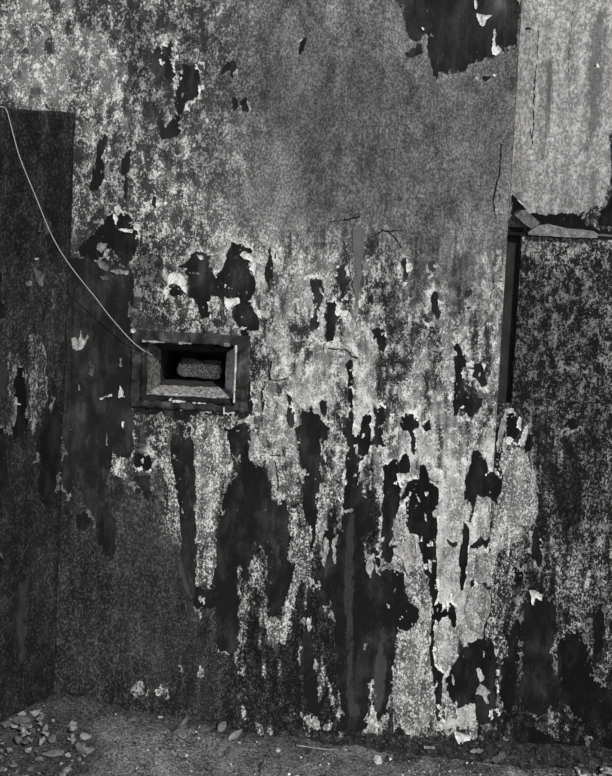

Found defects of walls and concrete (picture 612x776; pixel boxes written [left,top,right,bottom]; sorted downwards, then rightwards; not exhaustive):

peeling [395,0,531,84]
peeling [150,39,205,143]
peeling [120,142,135,200]
peeling [151,196,168,210]
peeling [510,194,612,235]
peeling [448,341,489,422]
peeling [0,208,296,655]
peeling [283,360,612,749]
leakage [344,514,360,717]
leakage [372,627,387,712]
peeling [454,731,506,763]